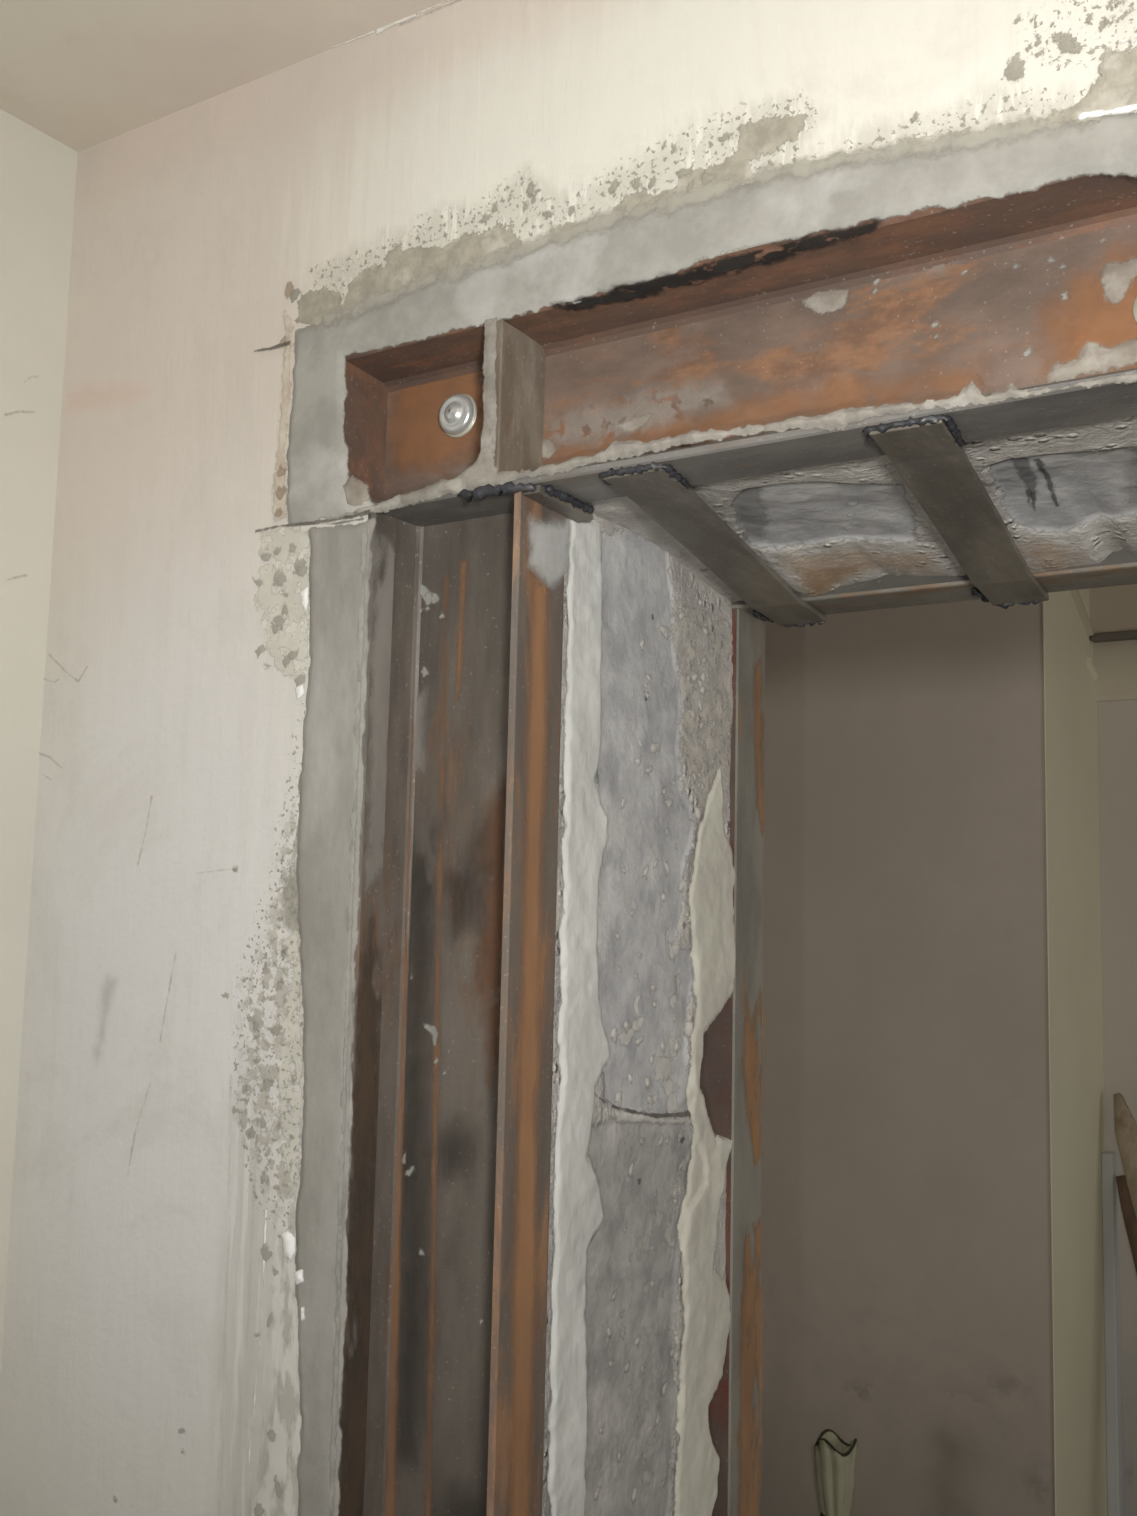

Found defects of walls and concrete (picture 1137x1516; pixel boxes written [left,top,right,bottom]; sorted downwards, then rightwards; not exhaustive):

corrosion [1061,276,1137,364]
peeling [223,0,1137,1284]
corrosion [755,663,764,833]
corrosion [384,728,413,1516]
corrosion [432,947,440,1215]
corrosion [485,796,505,1057]
corrosion [512,581,546,1516]
spalling [585,528,733,1516]
corrosion [744,997,764,1164]
corrosion [739,1222,763,1516]